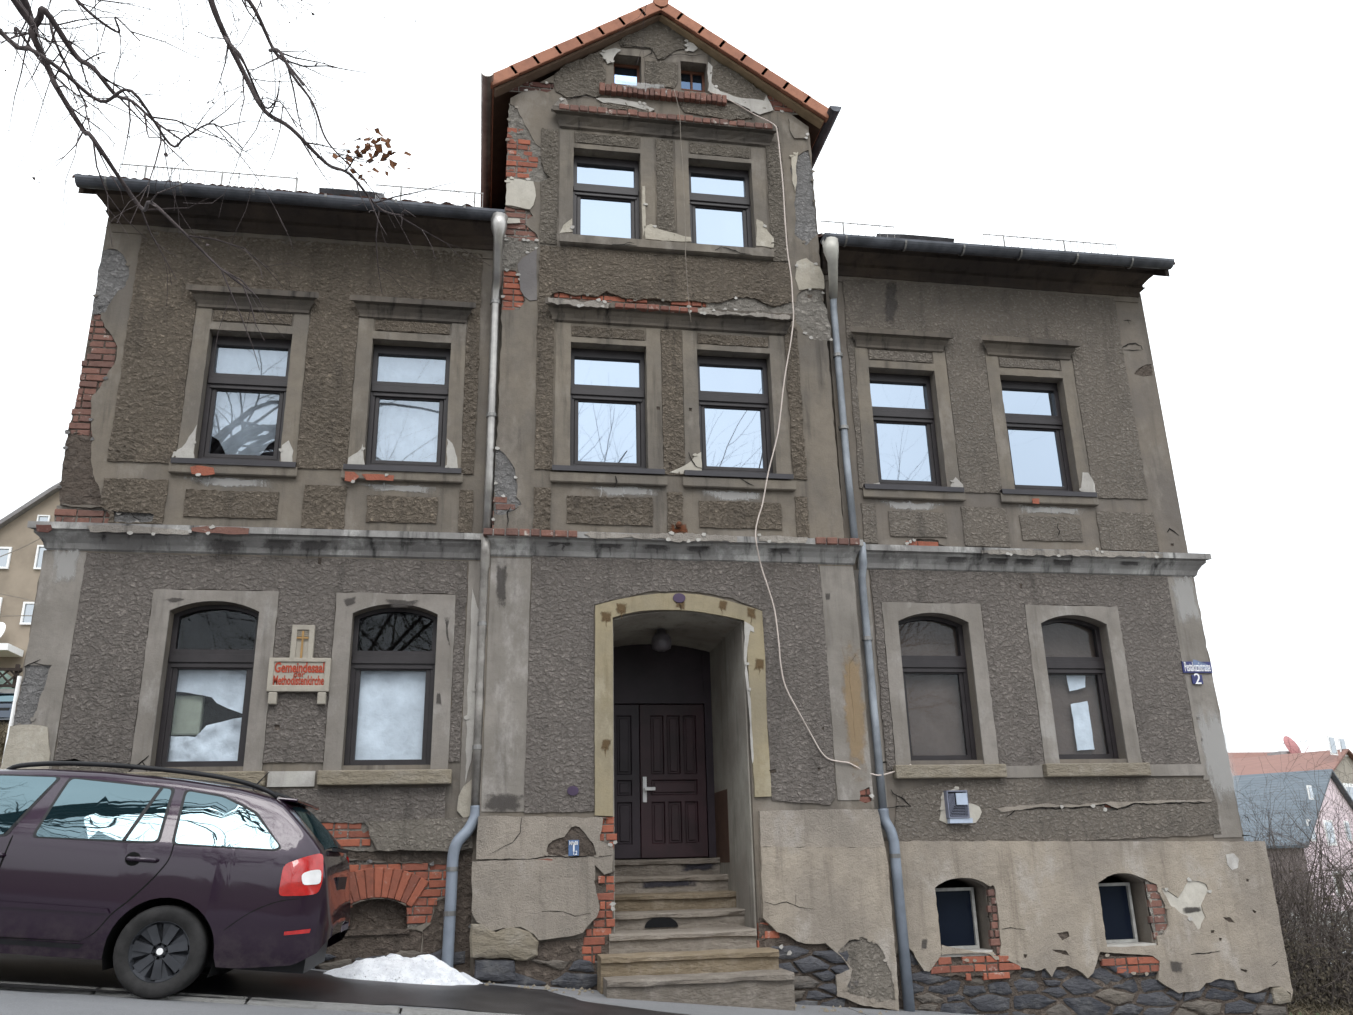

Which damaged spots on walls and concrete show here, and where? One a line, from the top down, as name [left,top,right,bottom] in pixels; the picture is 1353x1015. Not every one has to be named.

flaking render [600,48,621,64]
spalling [501,62,833,341]
flaking render [36,249,249,536]
peeling [55,549,78,579]
spalling [539,817,617,861]
spalling [321,821,473,971]
flaking render [582,871,616,963]
flaking render [756,917,792,955]
flaking render [838,936,895,1004]
flaking render [1098,954,1159,976]
flaking render [1144,877,1234,941]